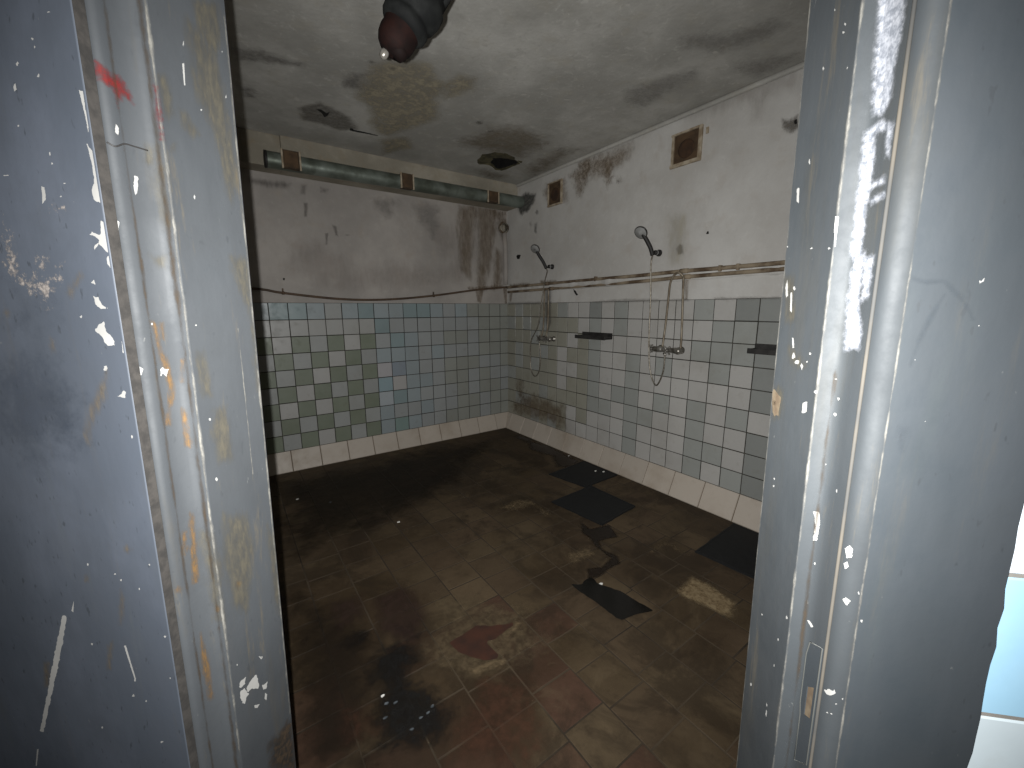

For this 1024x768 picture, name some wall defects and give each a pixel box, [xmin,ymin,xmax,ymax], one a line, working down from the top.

peeling [79,90,100,202]
peeling [90,221,110,267]
peeling [95,322,124,353]
peeling [239,675,268,708]